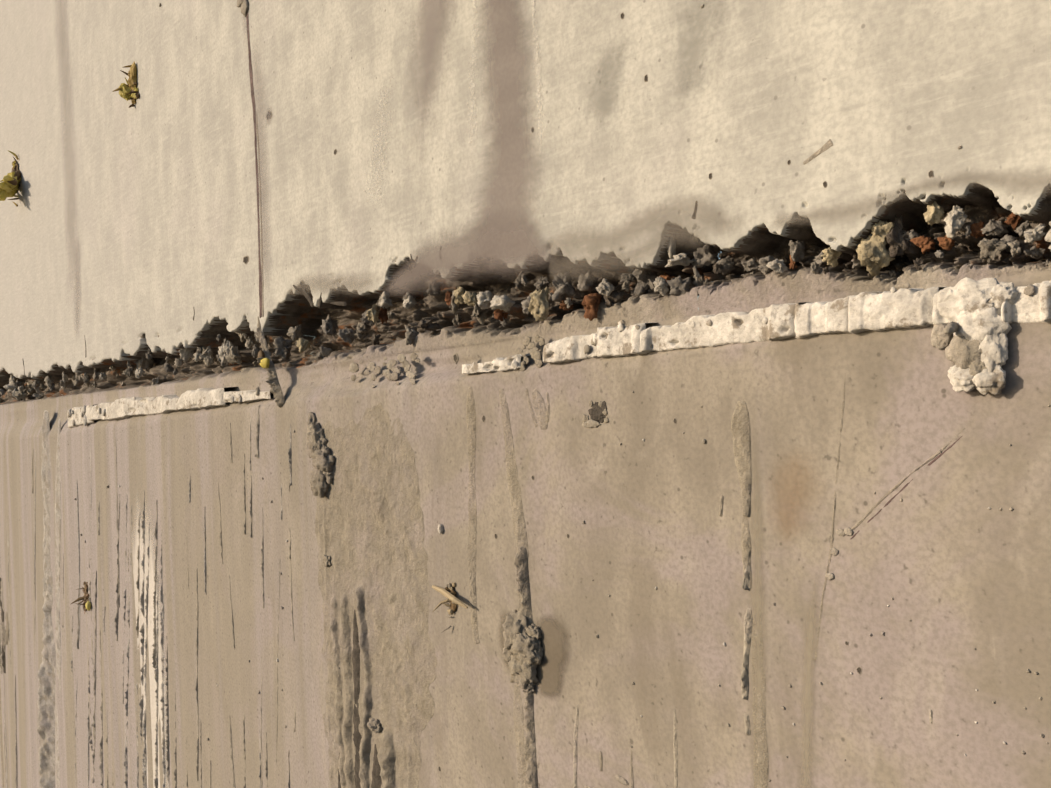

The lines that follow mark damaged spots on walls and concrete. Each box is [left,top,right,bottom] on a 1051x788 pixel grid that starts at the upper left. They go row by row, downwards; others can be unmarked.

water stain [391,0,543,291]
water stain [37,410,61,788]
crack [815,378,965,660]